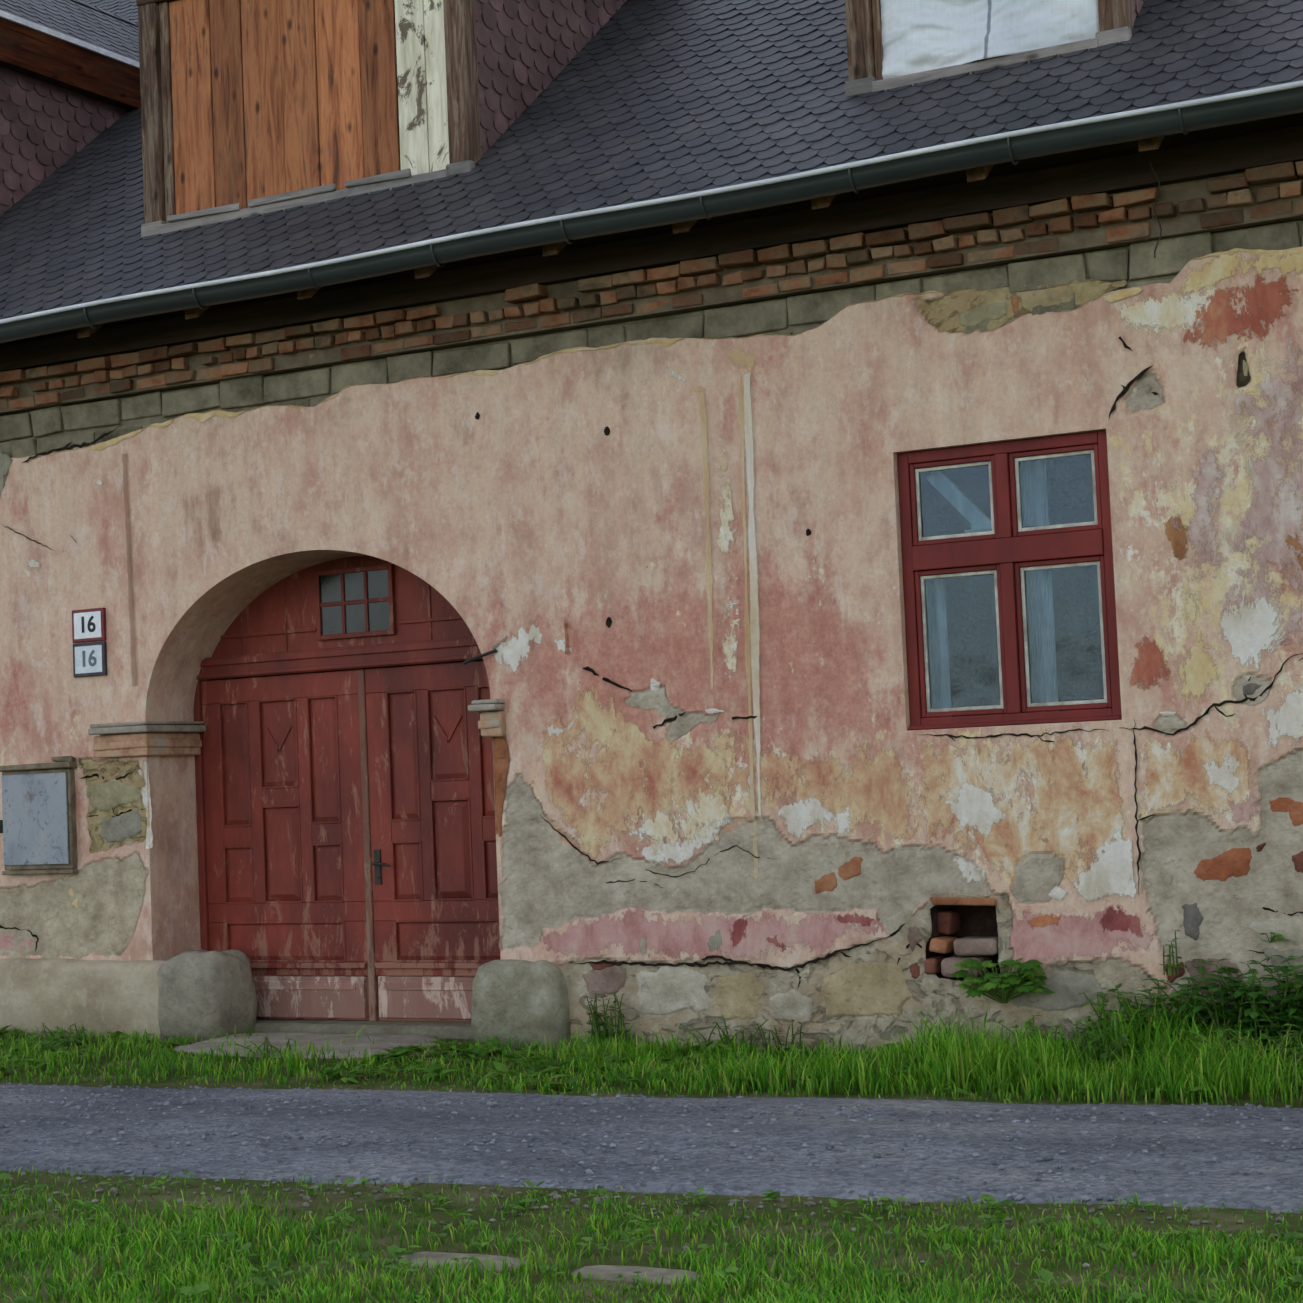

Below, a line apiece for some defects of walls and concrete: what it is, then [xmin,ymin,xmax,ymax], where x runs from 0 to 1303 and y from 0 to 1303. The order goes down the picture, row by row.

spalling [0,220,1303,1058]
crack [582,666,632,692]
crack [653,711,686,729]
crack [732,714,757,722]
crack [924,653,1303,897]
crack [0,925,39,951]